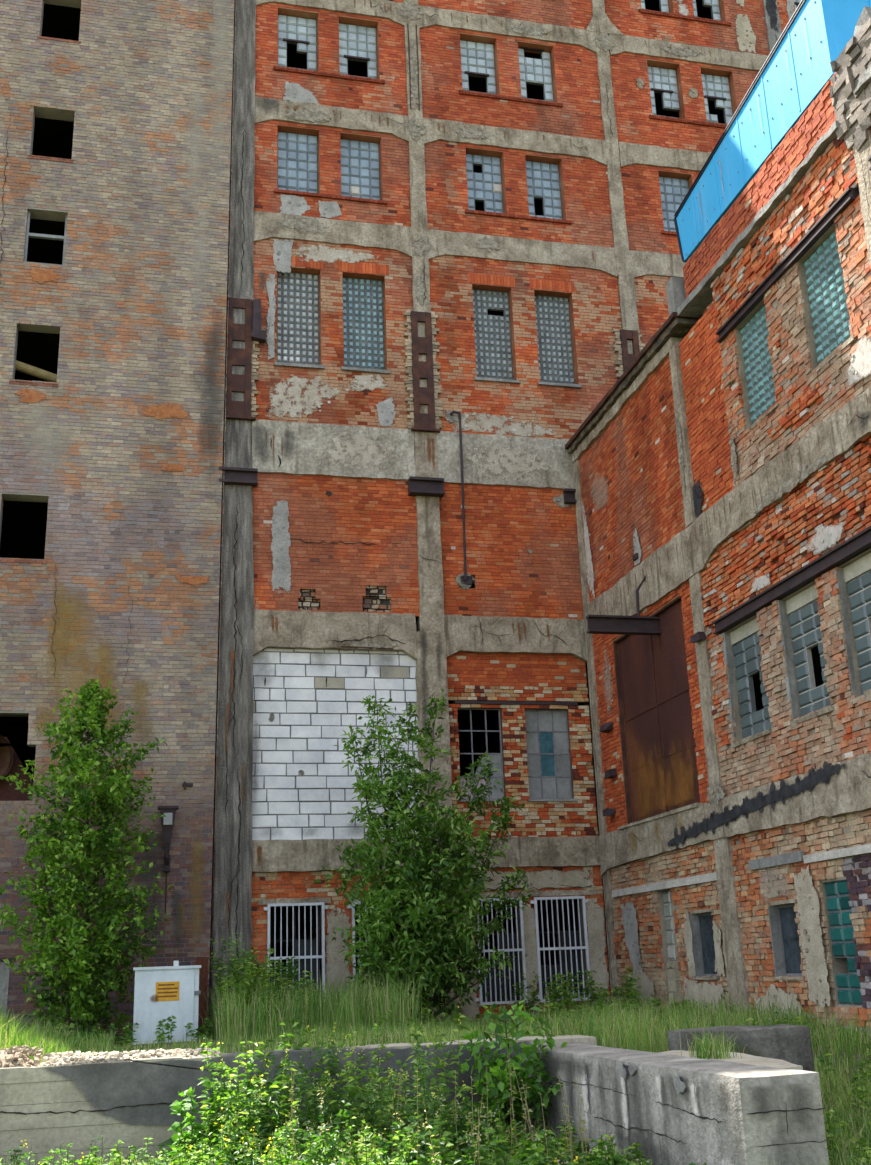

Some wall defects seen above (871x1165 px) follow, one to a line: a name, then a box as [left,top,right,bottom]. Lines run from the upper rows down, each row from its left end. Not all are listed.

flaking render [735,0,756,53]
leakage [766,0,780,41]
crack [0,109,12,283]
flaking render [251,194,556,484]
flaking render [847,337,871,388]
flaking render [806,522,843,553]
leakage [674,761,829,850]
crack [0,1101,201,1115]